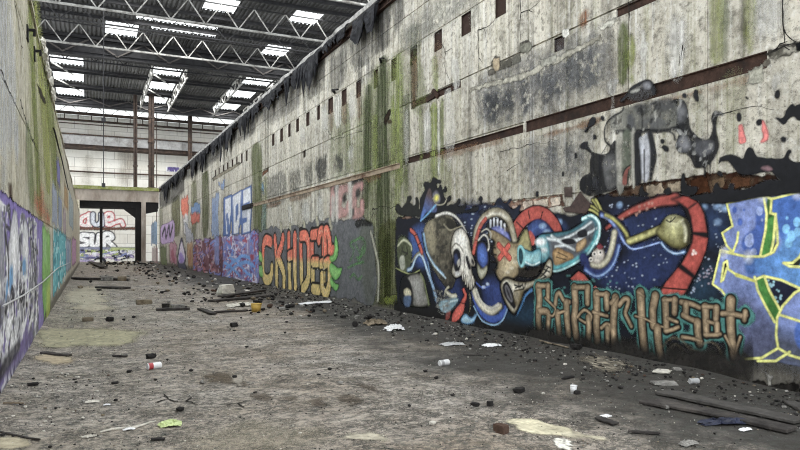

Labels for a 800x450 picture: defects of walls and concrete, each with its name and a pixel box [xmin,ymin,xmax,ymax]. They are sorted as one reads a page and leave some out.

damp [28,10,73,233]
damp [364,56,402,305]
flaking render [504,194,565,211]